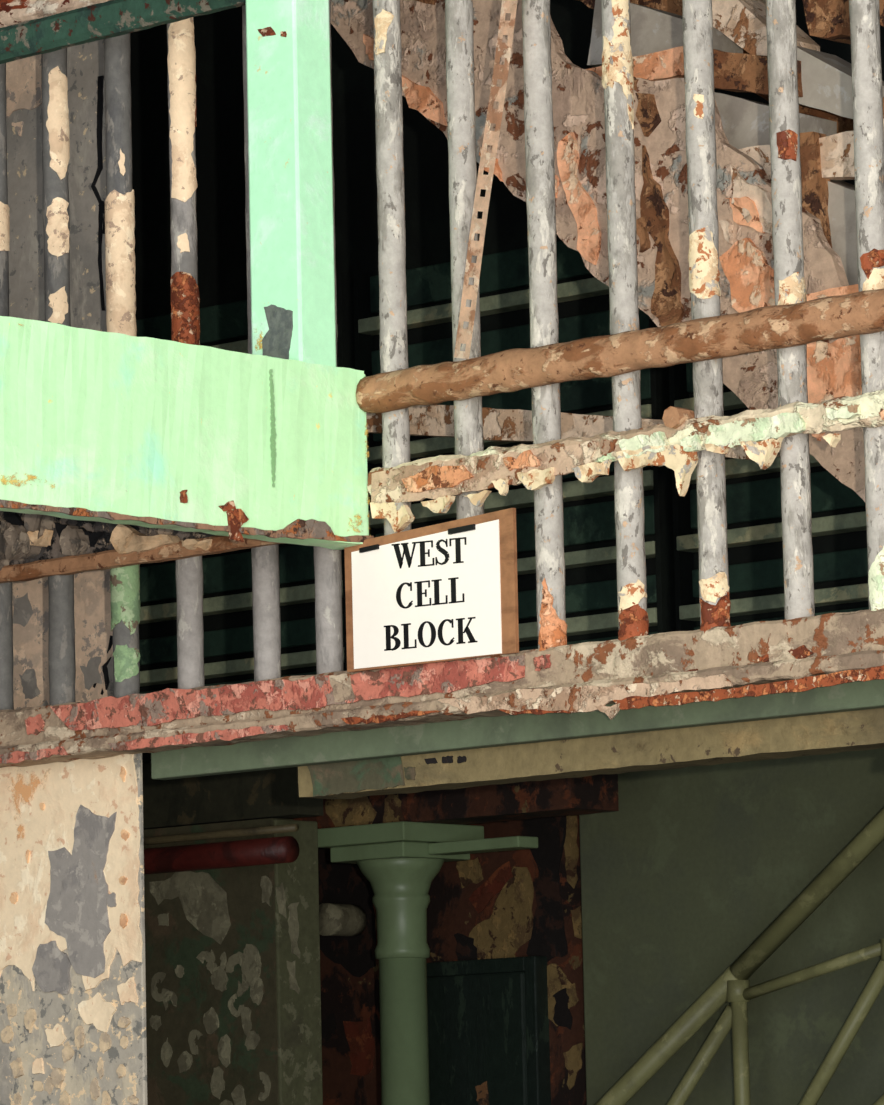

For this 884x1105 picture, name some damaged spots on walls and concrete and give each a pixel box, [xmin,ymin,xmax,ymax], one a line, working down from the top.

peeling [6,54,70,180]
peeling [105,190,137,337]
rust [860,248,884,279]
rust [171,272,200,345]
peeling [262,305,293,359]
peeling [370,335,862,533]
peeling [0,514,733,735]
rust [538,578,567,651]
rust [618,579,649,641]
rust [699,572,731,634]
rust [612,665,884,710]
peeling [0,754,271,1105]